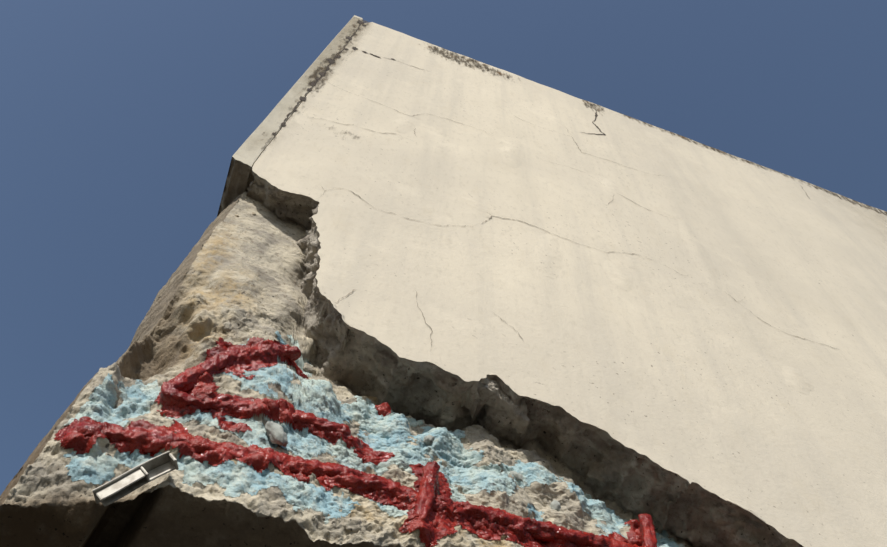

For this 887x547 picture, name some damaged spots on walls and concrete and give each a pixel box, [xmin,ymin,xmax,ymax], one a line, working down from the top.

mould [308,21,366,92]
crack [272,20,459,137]
mould [429,46,509,78]
crack [564,104,626,171]
spalling [0,157,804,547]